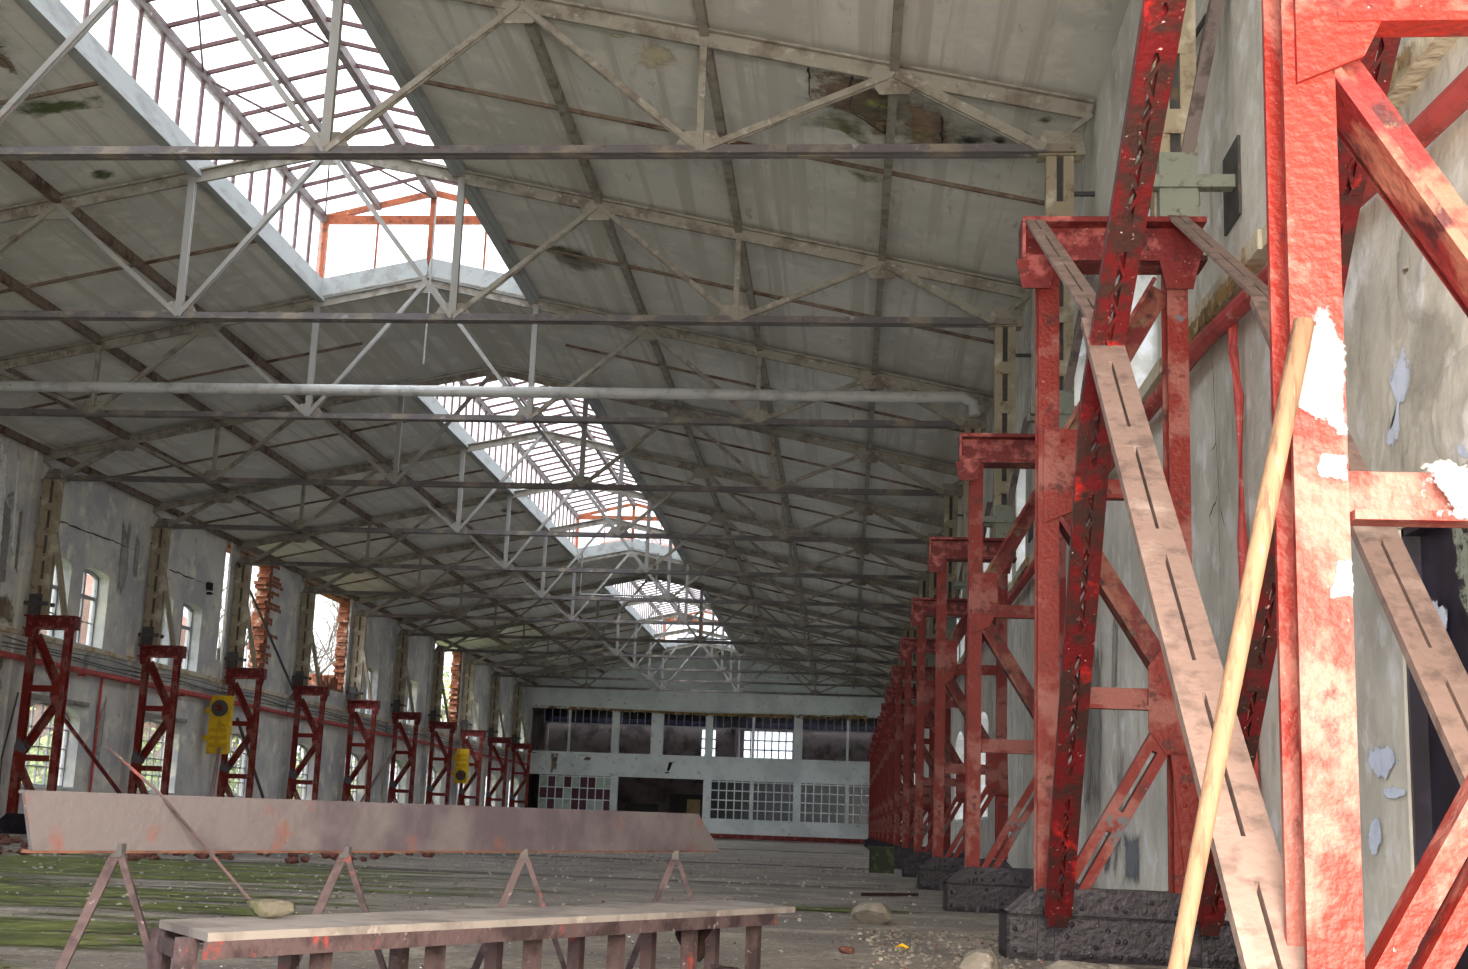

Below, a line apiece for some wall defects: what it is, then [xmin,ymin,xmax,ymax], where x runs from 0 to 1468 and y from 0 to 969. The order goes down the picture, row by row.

water stain [21,97,98,118]
water stain [808,72,1004,144]
water stain [555,247,599,269]
flaking render [226,544,283,668]
flaking render [305,579,351,693]
peeling [1452,528,1468,613]
peeling [1365,745,1407,799]
peeling [1367,817,1382,856]